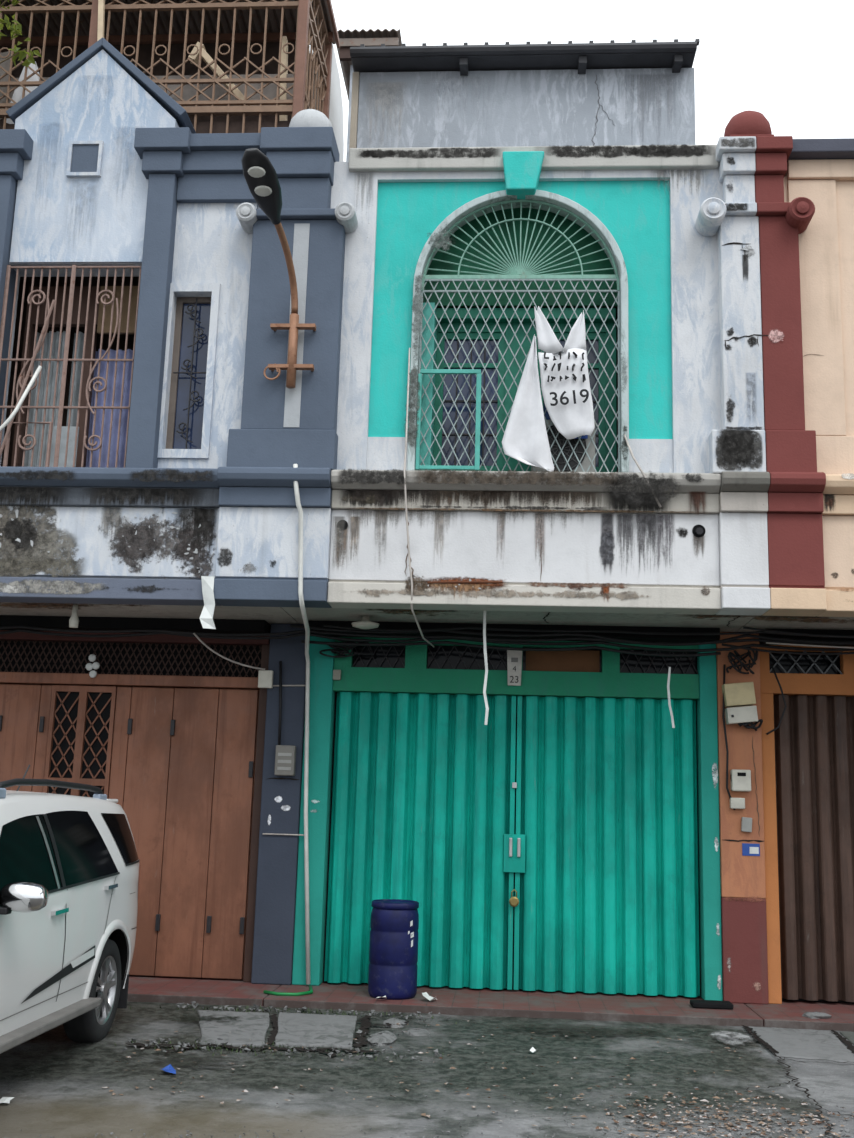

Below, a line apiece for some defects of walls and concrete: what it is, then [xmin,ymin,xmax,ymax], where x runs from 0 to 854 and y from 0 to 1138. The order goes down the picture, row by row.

crack [591,75,614,146]
damp [360,147,496,158]
damp [550,144,709,186]
damp [722,138,755,164]
damp [725,184,747,211]
damp [716,373,762,470]
damp [0,470,73,505]
damp [333,426,705,569]
damp [90,469,256,578]
damp [360,589,648,616]
corrosion [530,582,624,600]